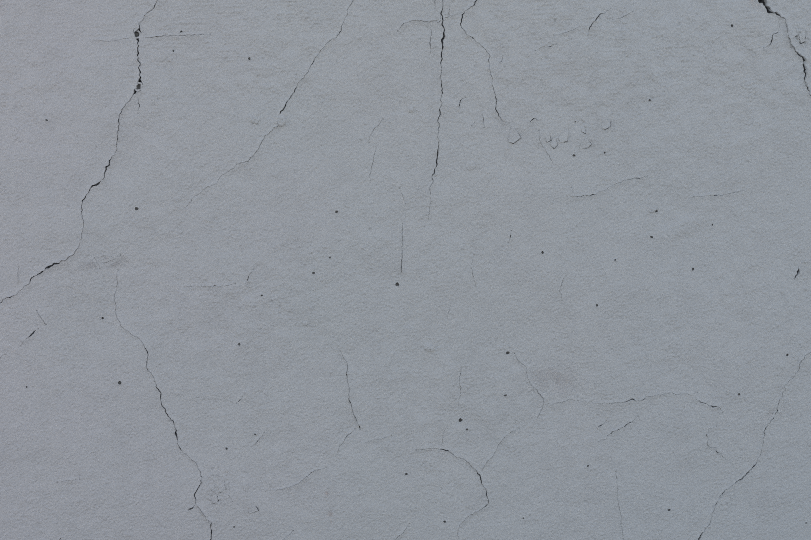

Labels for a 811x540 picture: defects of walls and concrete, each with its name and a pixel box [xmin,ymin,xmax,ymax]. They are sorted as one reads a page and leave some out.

crack [586,7,612,36]
crack [756,0,811,102]
crack [183,0,358,211]
crack [396,0,542,219]
crack [567,174,647,201]
crack [0,0,259,540]
crack [792,267,803,280]
crack [338,349,364,430]
crack [416,426,520,540]
crack [596,415,640,445]
crack [691,349,811,540]